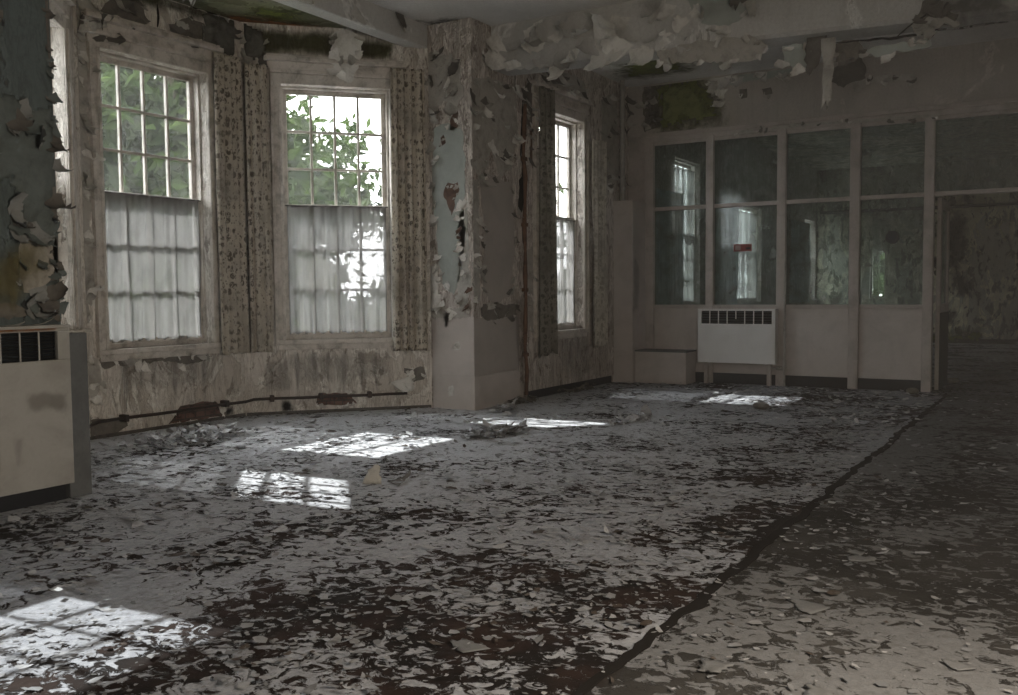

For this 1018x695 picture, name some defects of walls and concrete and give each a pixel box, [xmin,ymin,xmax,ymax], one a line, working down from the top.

peeling [41,0,63,138]
peeling [100,0,151,30]
peeling [169,0,205,48]
peeling [774,42,807,77]
peeling [834,0,961,68]
peeling [424,0,768,324]